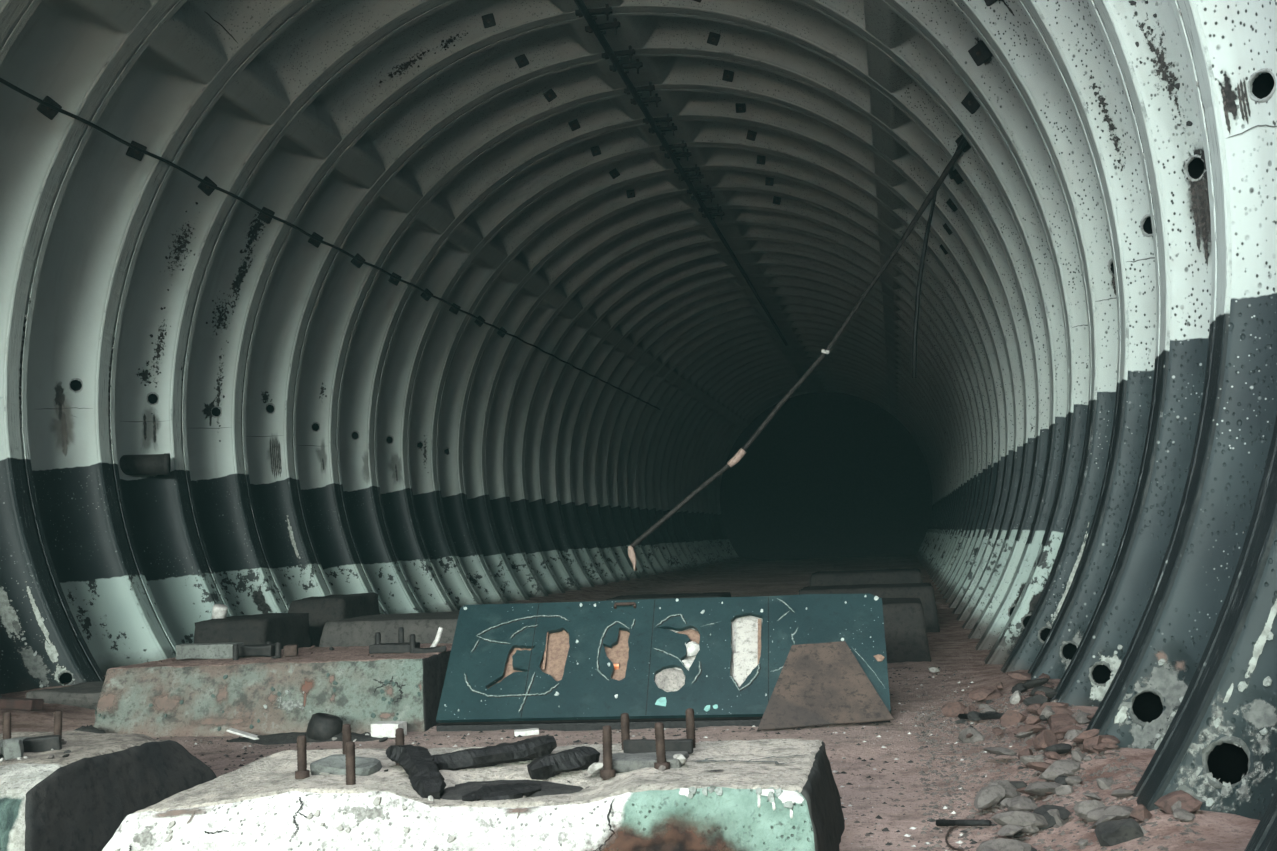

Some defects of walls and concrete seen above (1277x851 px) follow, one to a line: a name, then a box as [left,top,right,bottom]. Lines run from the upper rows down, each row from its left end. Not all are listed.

peeling [0,581,76,688]
spalling [251,588,272,614]
peeling [1004,522,1089,660]
spalling [1088,645,1123,701]
spalling [1114,652,1188,750]
spalling [1169,599,1277,813]
crack [293,797,307,836]
rust [598,816,746,851]